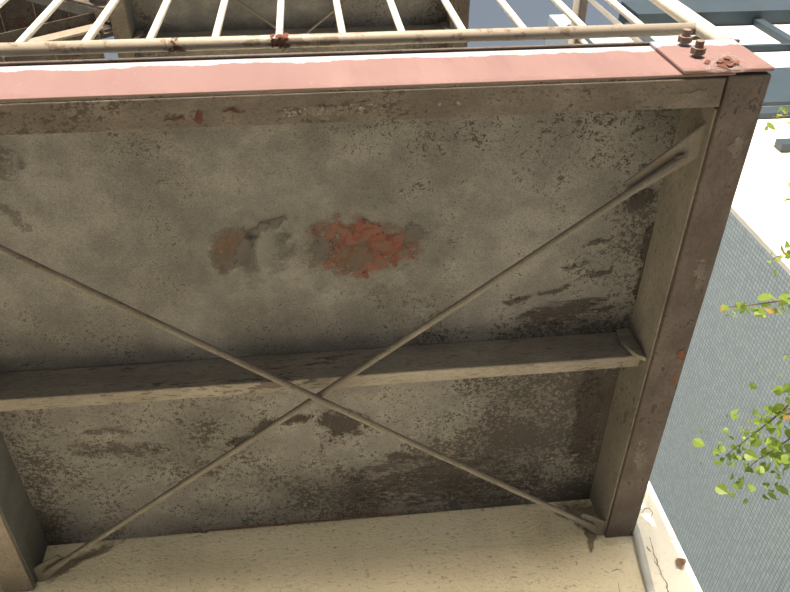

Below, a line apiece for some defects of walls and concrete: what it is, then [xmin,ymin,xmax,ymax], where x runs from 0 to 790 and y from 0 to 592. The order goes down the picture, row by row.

corrosion [269,32,291,49]
corrosion [704,56,740,69]
corrosion [193,198,443,290]
crack [646,539,669,592]